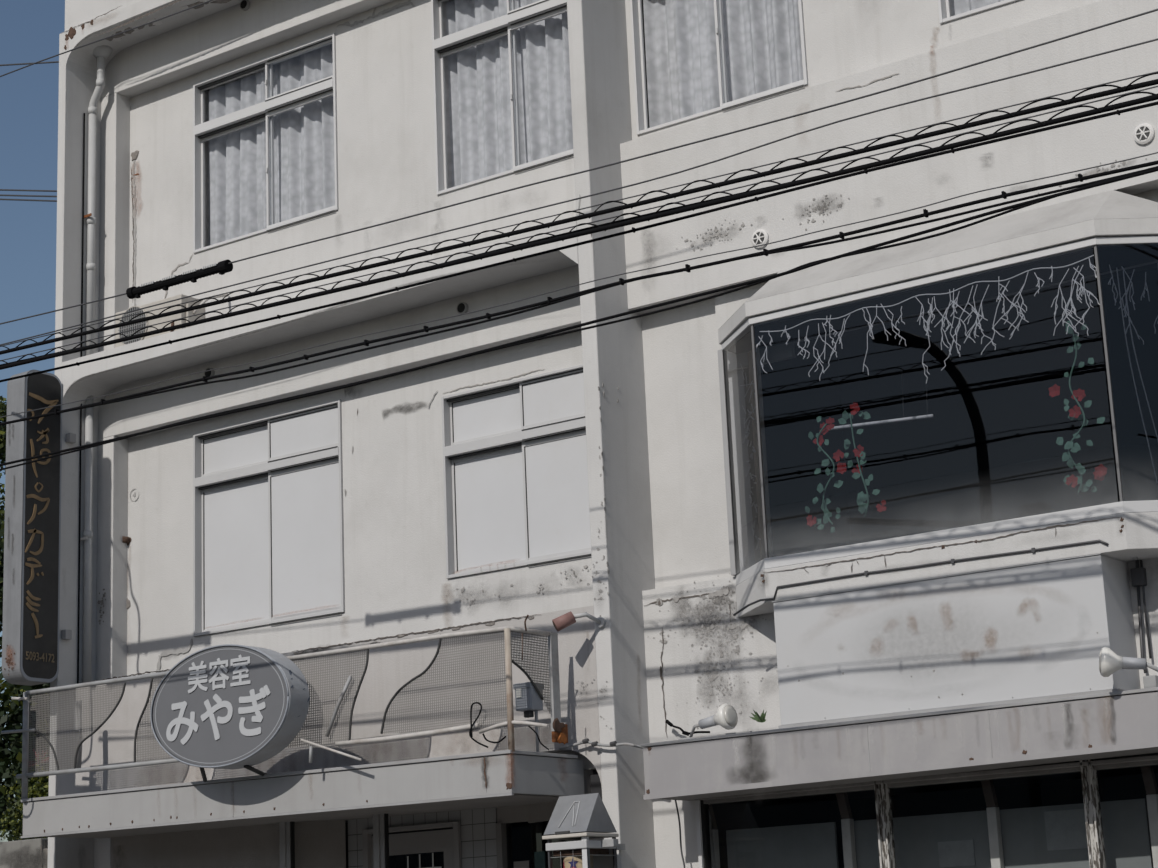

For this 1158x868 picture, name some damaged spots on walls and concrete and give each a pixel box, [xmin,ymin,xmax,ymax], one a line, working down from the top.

crack [337,0,415,27]
crack [658,600,667,735]
damp [648,573,767,729]